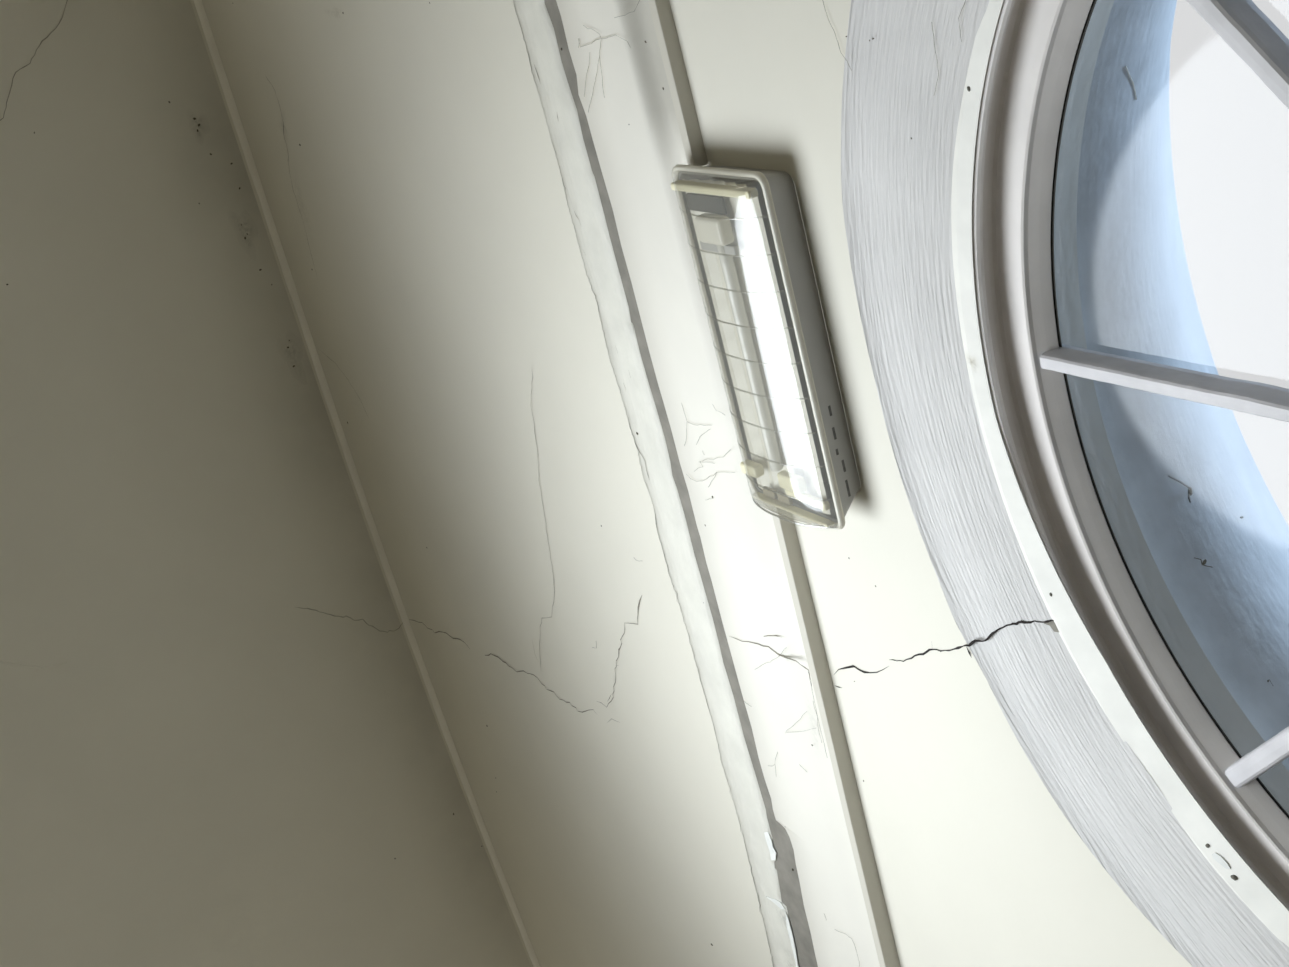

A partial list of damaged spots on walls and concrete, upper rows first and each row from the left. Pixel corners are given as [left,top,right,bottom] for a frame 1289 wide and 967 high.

crack [0,0,68,121]
crack [297,373,642,722]
crack [732,620,1054,688]
peeling [764,832,777,860]
peeling [766,896,799,967]